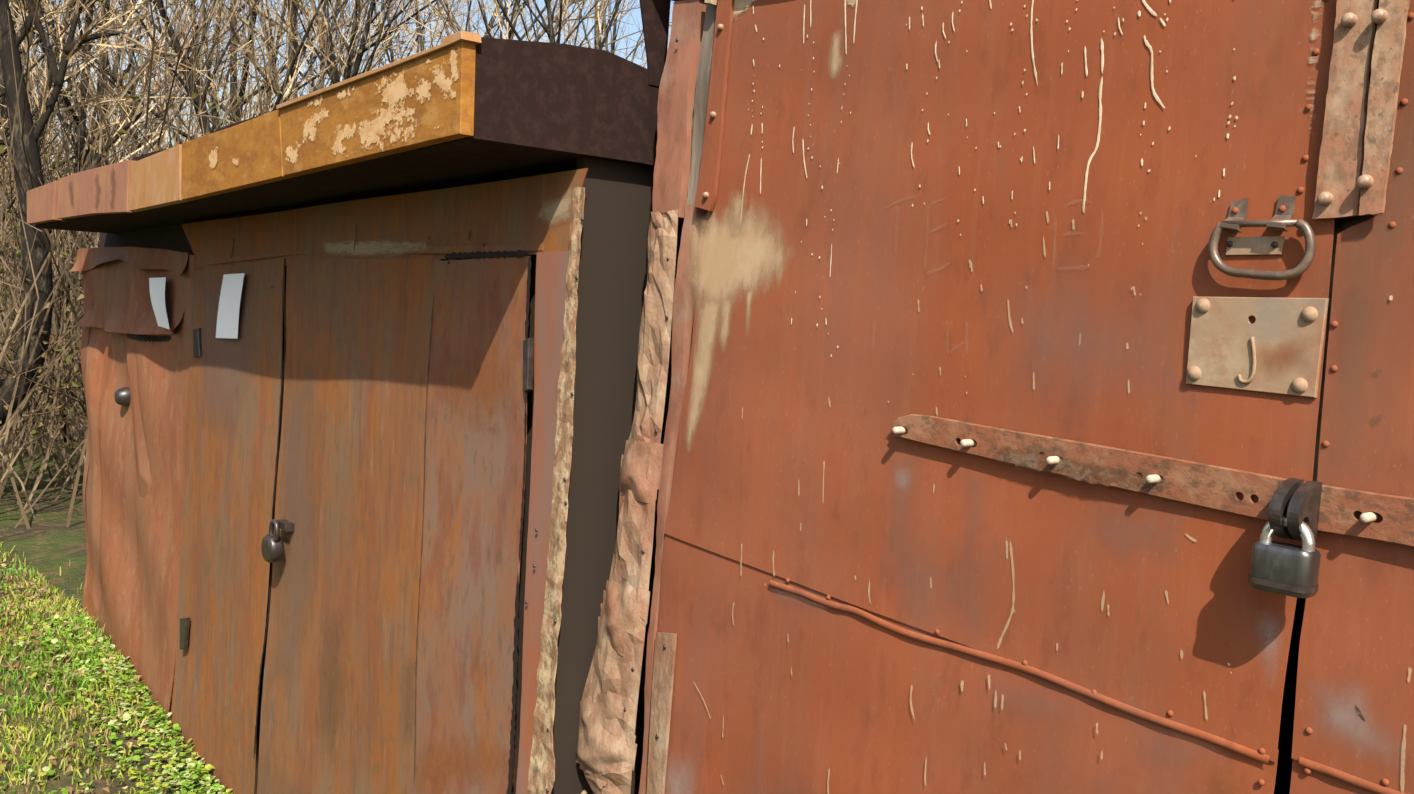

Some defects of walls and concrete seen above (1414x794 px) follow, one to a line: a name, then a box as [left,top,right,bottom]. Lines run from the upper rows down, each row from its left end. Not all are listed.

peeling [831,35,840,74]
peeling [285,49,459,164]
peeling [692,212,783,309]
rust [994,447,1168,492]